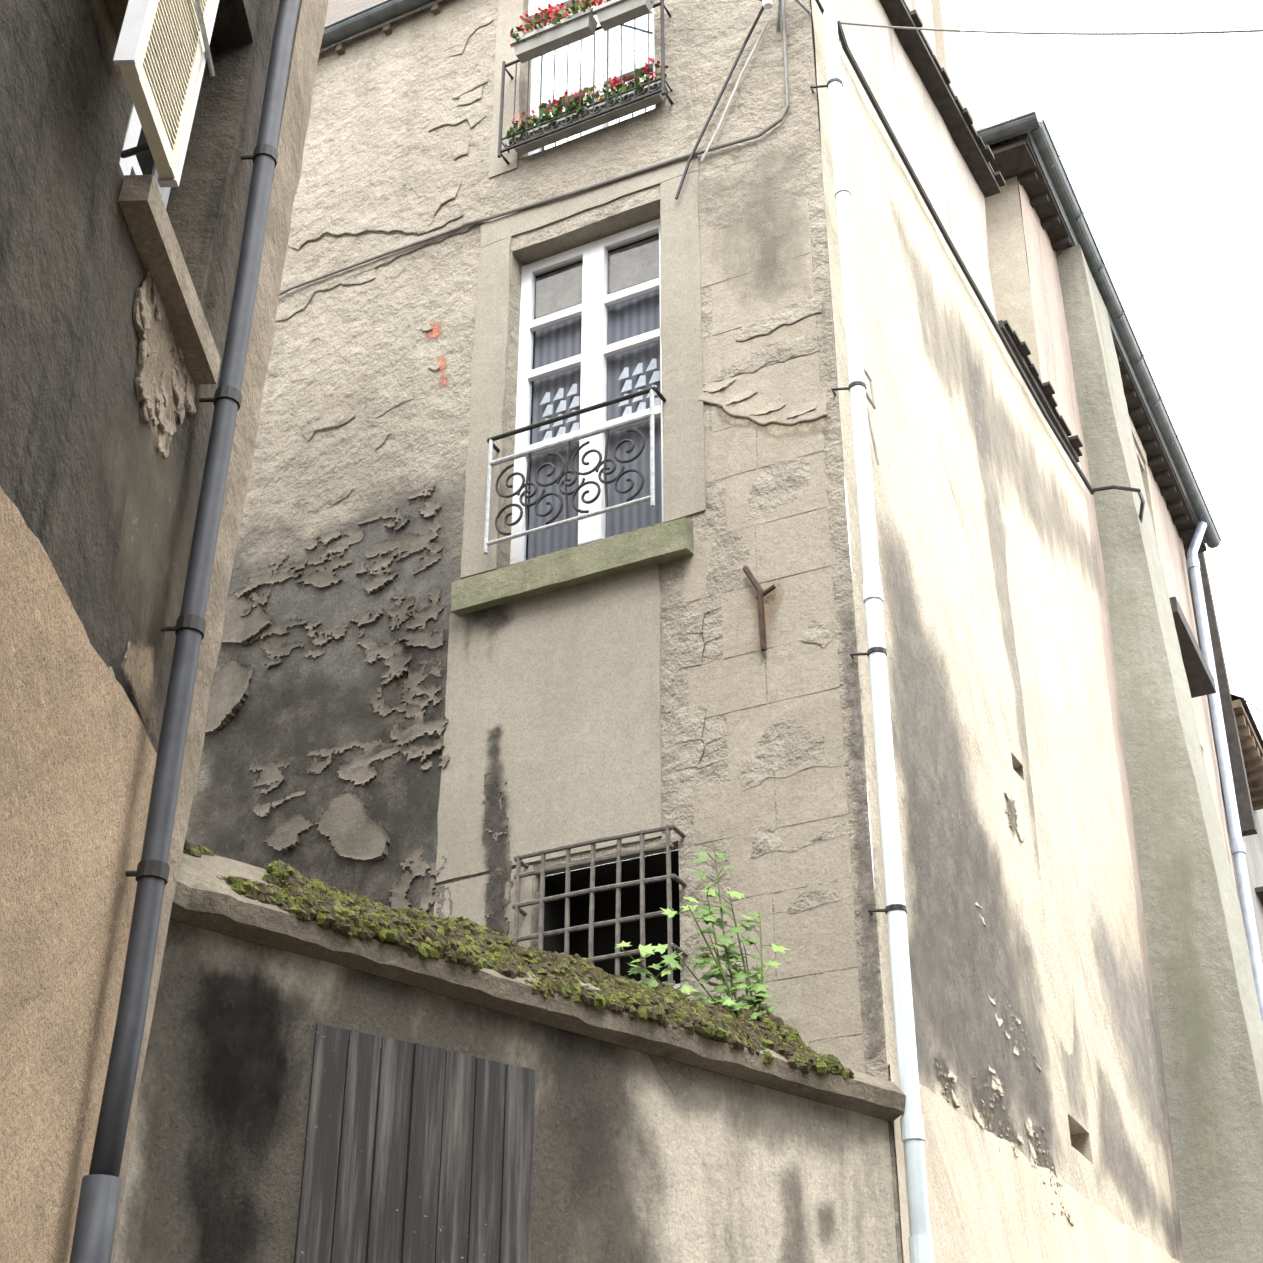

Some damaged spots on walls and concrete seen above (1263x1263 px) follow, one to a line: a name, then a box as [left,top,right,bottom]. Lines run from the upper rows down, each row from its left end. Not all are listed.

crack [276,9,495,321]
spalling [133,269,196,459]
crack [716,290,825,382]
flaking render [205,485,452,919]
water stain [189,492,508,910]
spalling [1004,789,1025,843]
water stain [129,927,653,1263]
water stain [787,1176,806,1263]
water stain [820,1207,833,1232]
spalling [934,1056,1074,1227]
spalling [987,993,1041,1072]